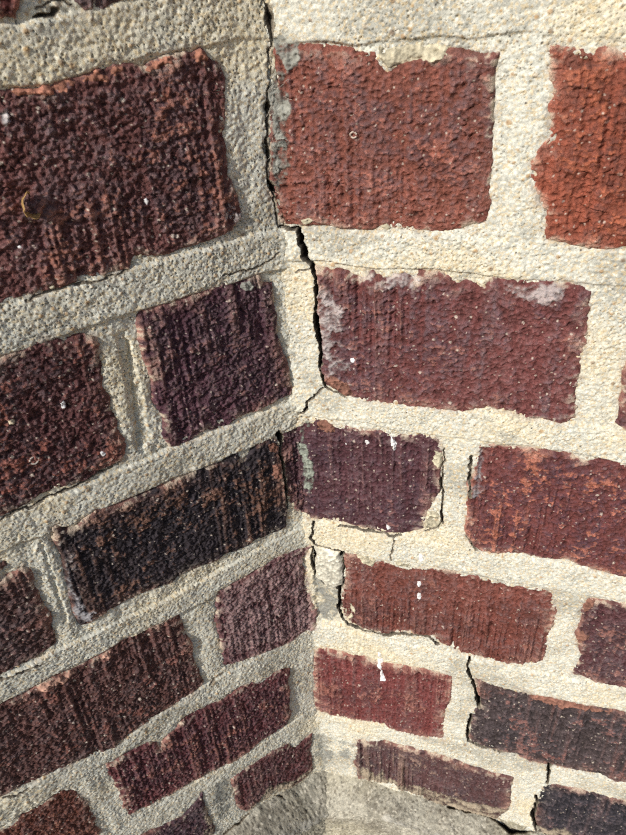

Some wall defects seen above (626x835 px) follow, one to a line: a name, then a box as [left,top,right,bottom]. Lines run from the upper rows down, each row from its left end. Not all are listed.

crack [222,0,347,415]
crack [275,430,289,509]
peeling [313,547,346,619]
crack [465,656,503,754]
crack [447,762,552,835]